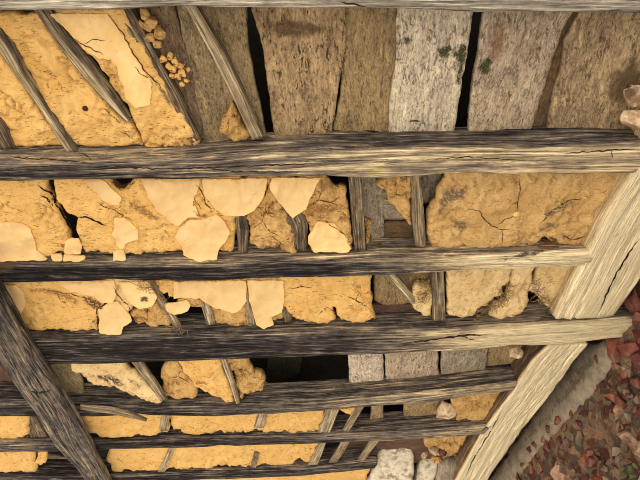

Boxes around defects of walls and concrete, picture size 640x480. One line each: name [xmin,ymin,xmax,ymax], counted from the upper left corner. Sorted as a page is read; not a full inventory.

flaking render [50,13,152,108]
flaking render [0,222,85,262]
flaking render [84,179,134,205]
flaking render [111,217,139,261]
crack [4,153,316,243]
flaking render [131,176,338,262]
flaking render [308,221,351,253]
crack [469,180,521,242]
flaking render [5,280,157,335]
flaking render [165,280,284,329]
crack [598,241,638,313]